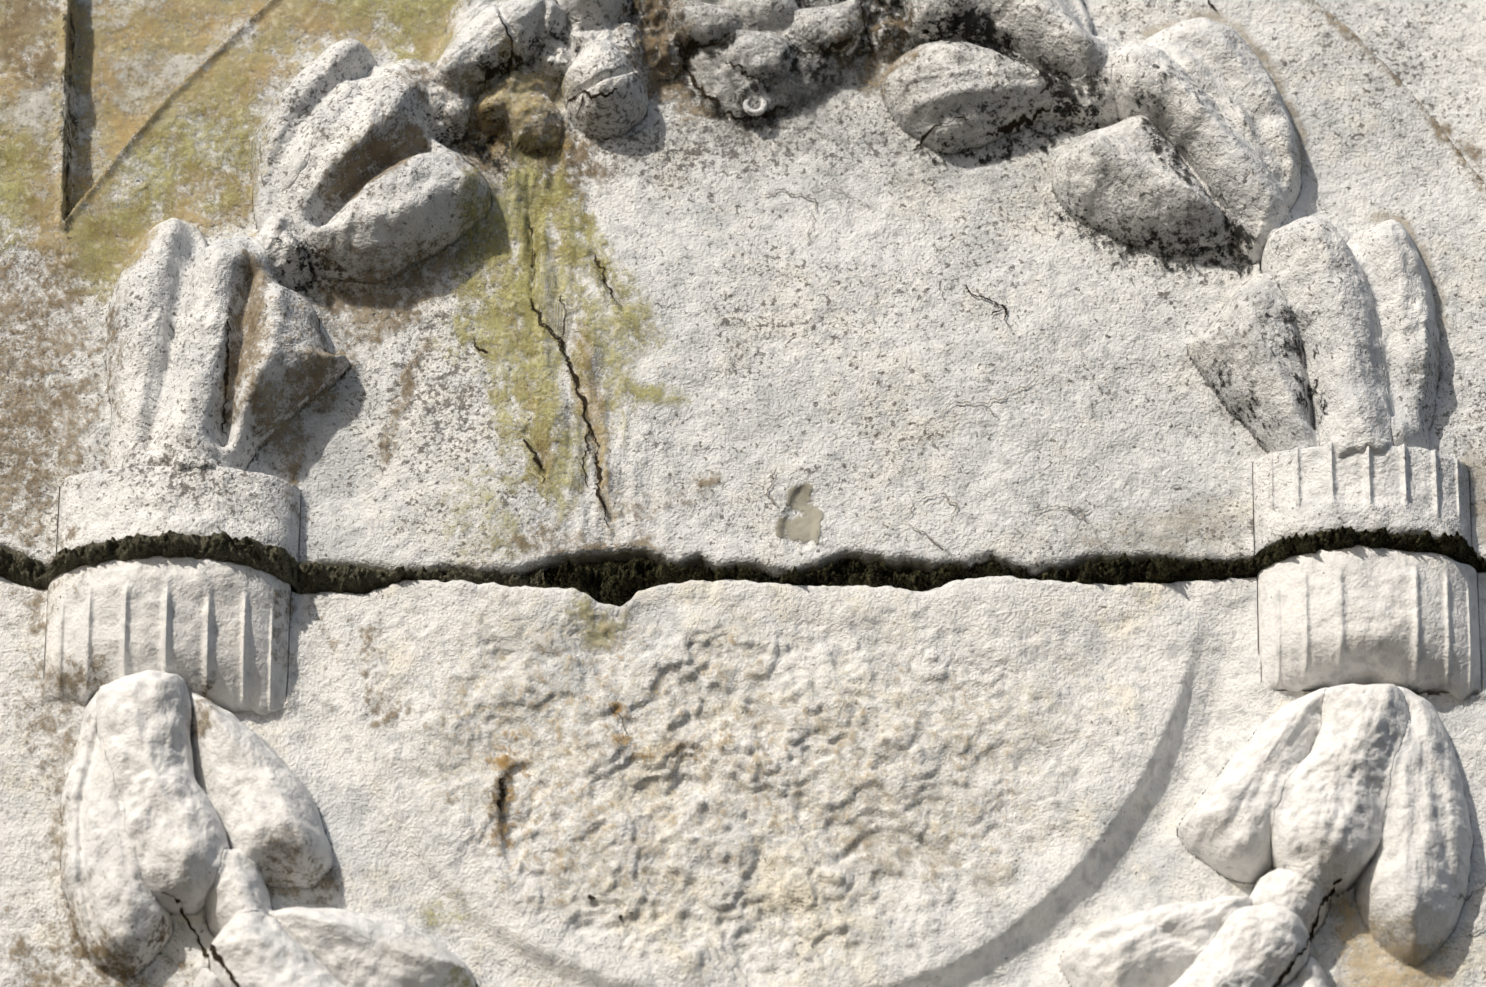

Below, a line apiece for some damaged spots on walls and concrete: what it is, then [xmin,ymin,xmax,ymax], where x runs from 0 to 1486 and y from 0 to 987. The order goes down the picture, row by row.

water stain [0,0,135,550]
water stain [215,57,663,530]
crack [593,252,624,311]
crack [528,221,609,526]
crack [523,439,545,483]
crack [766,469,778,515]
crack [904,493,958,558]
crack [1032,504,1107,554]
crack [161,892,239,987]
crack [1273,878,1342,987]